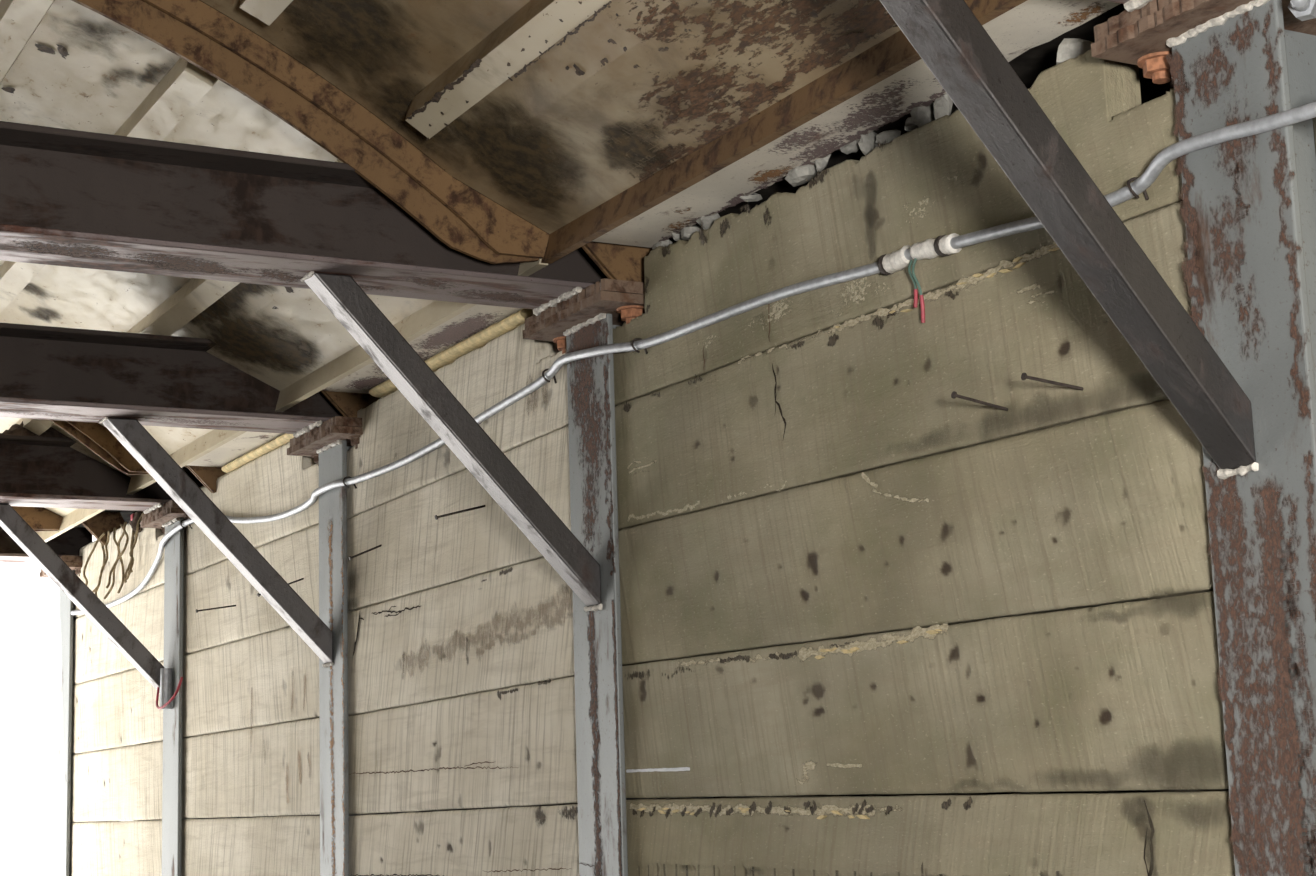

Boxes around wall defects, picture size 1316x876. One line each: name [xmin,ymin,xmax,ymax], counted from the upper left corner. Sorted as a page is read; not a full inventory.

damp [189,283,318,373]
rust [565,321,616,575]
crack [768,304,786,439]
rust [1165,6,1311,419]
rust [587,600,622,876]
crack [1144,800,1155,876]
rust [1202,451,1316,876]